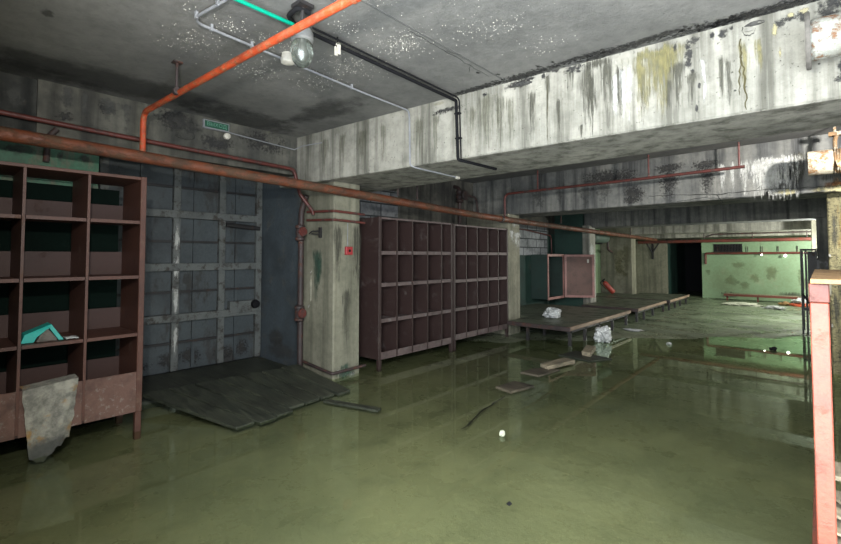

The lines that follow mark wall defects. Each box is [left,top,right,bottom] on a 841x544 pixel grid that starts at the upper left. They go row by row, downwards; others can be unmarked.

leakage [433,0,841,137]
crack [738,27,756,110]
leakage [581,169,645,205]
leakage [655,163,681,196]
leakage [691,152,807,197]
leakage [814,174,841,191]